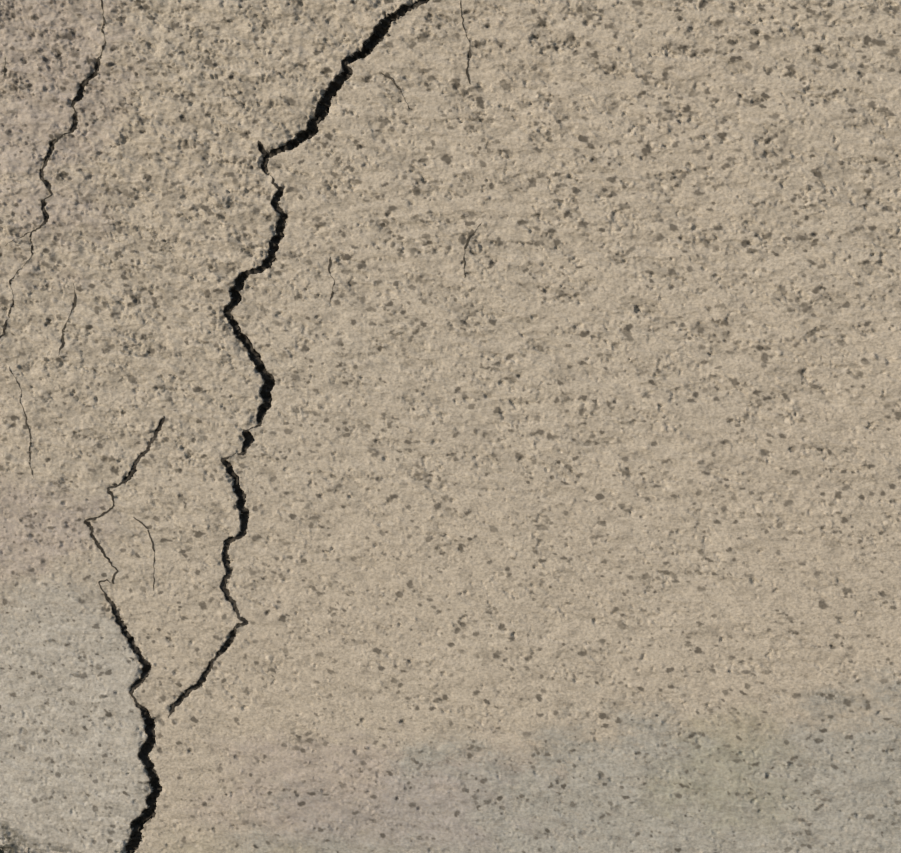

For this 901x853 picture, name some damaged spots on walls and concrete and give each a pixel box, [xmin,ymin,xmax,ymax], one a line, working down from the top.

crack [0,0,106,338]
crack [460,1,471,84]
crack [463,224,481,278]
crack [84,0,429,853]